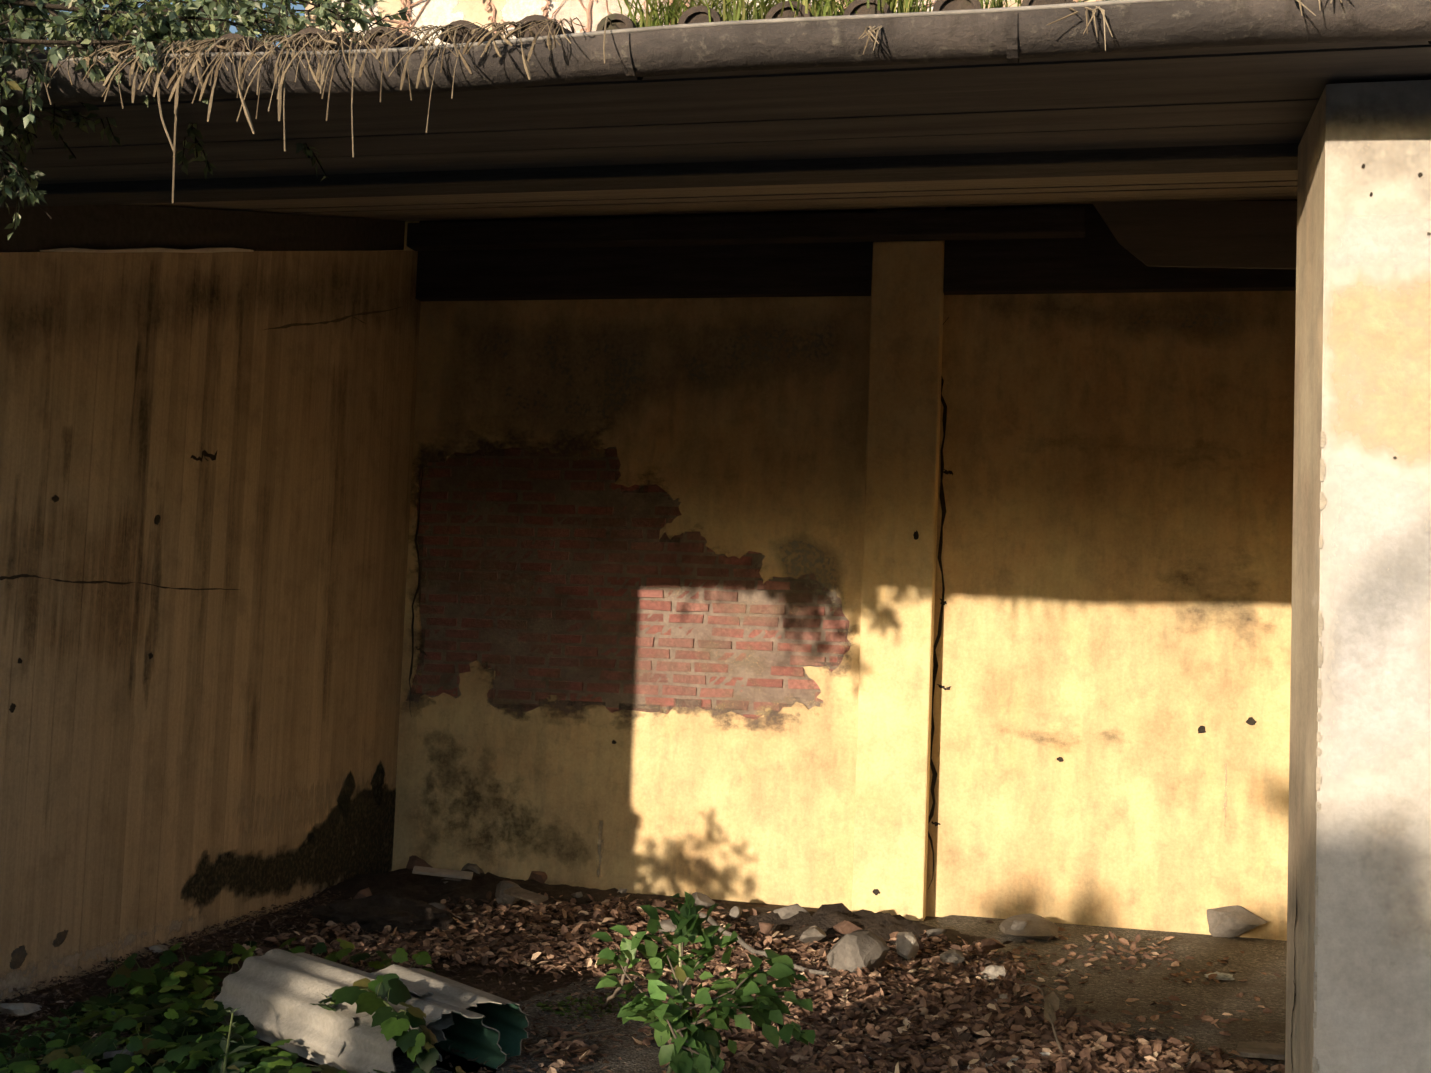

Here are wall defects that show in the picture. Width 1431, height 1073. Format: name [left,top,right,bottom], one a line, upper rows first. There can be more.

crack [0,574,239,590]
flaking render [407,431,851,729]
crack [928,375,953,889]
damp [170,761,396,931]